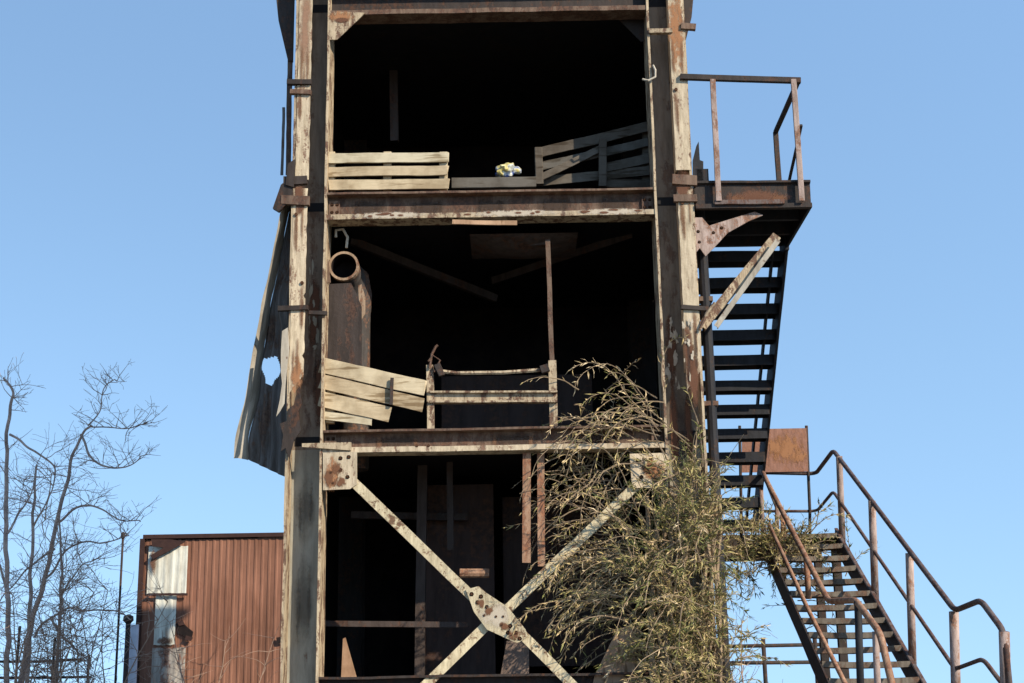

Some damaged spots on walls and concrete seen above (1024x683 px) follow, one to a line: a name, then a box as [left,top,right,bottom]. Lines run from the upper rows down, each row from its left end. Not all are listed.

corrosion [727,191,786,200]
corrosion [355,201,383,213]
corrosion [413,201,442,213]
corrosion [478,200,504,212]
corrosion [543,200,568,211]
corrosion [604,198,630,209]
peeling [307,259,320,350]
peeling [665,316,694,390]
corrosion [324,457,346,488]
corrosion [476,599,519,640]